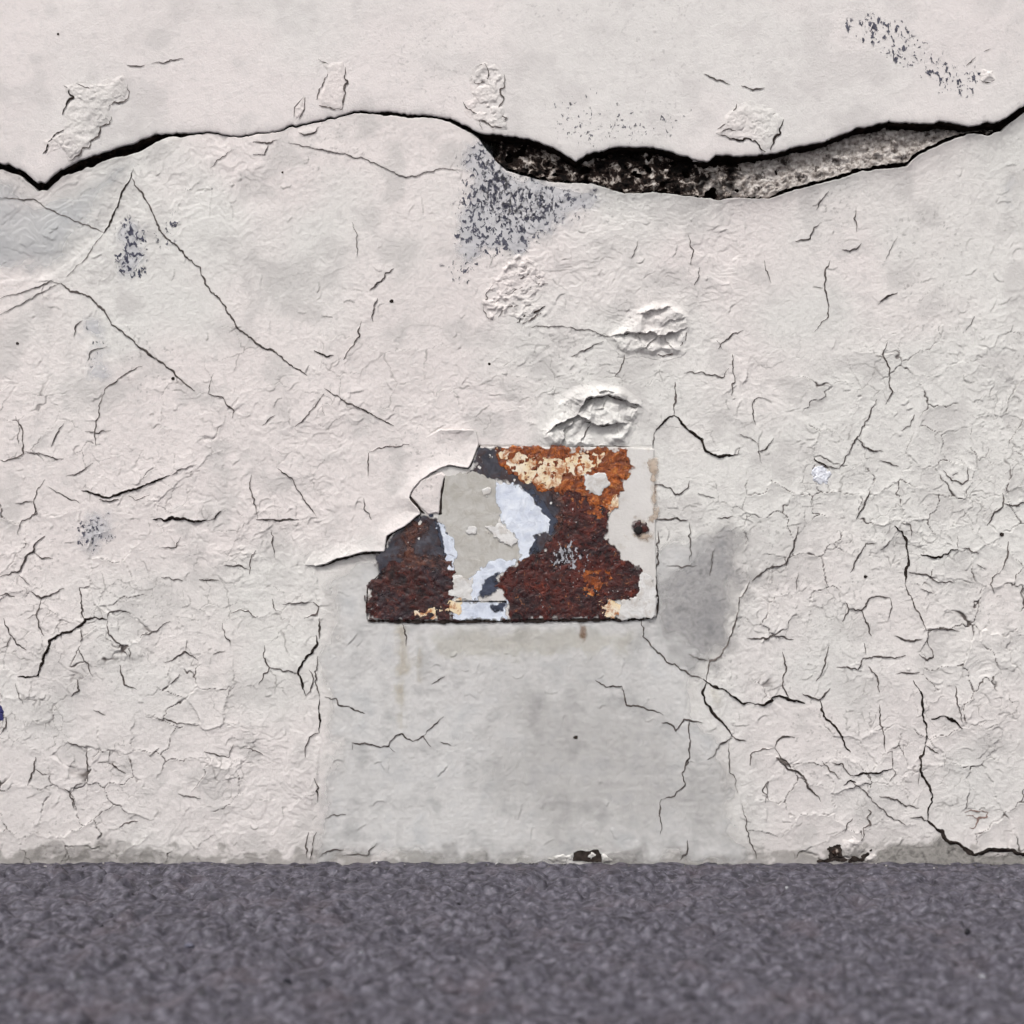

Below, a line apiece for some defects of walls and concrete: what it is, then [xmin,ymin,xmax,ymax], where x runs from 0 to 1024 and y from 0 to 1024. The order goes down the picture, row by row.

peeling [845,13,995,98]
peeling [441,143,608,336]
crack [0,107,1024,697]
crack [27,742,125,808]
crack [259,621,375,860]
crack [352,716,451,751]
corrosion [364,520,460,622]
peeling [305,429,750,863]
corrosion [494,445,643,638]
damp [661,528,739,652]
crack [595,484,1024,859]